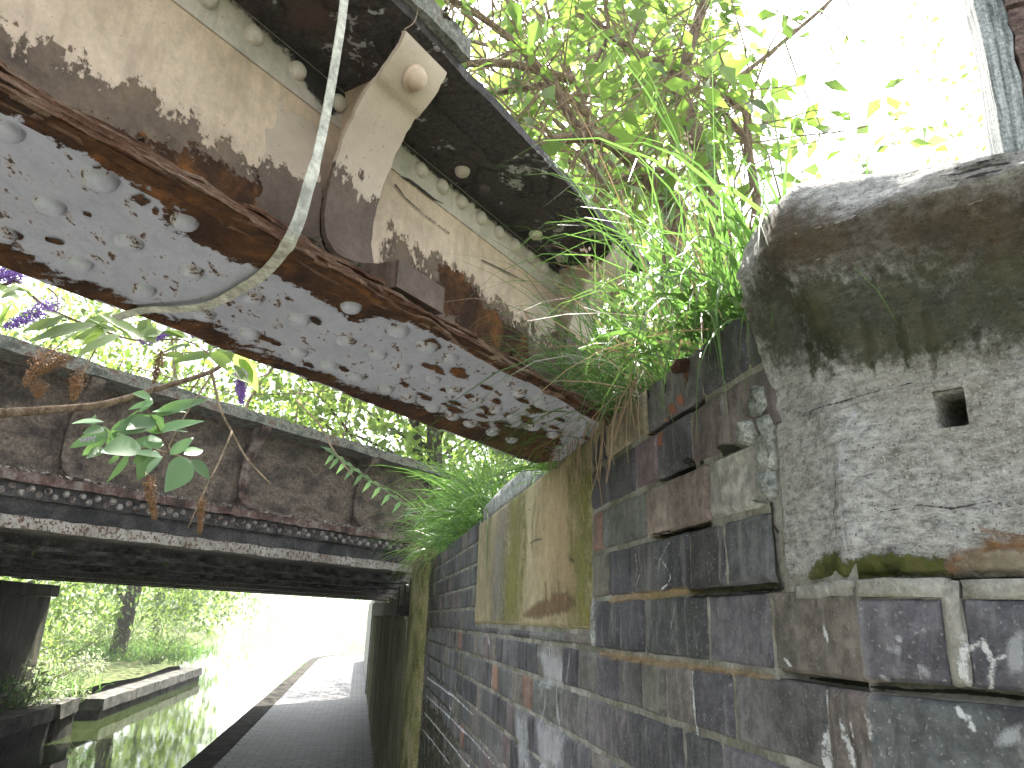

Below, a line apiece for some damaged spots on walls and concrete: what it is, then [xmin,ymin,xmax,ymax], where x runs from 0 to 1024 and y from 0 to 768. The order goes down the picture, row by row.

peeling [0,16,260,189]
damp [755,177,1024,281]
rust [0,60,612,463]
crack [803,382,913,419]
rust [944,527,1024,577]
damp [526,583,575,619]
damp [957,638,1006,692]